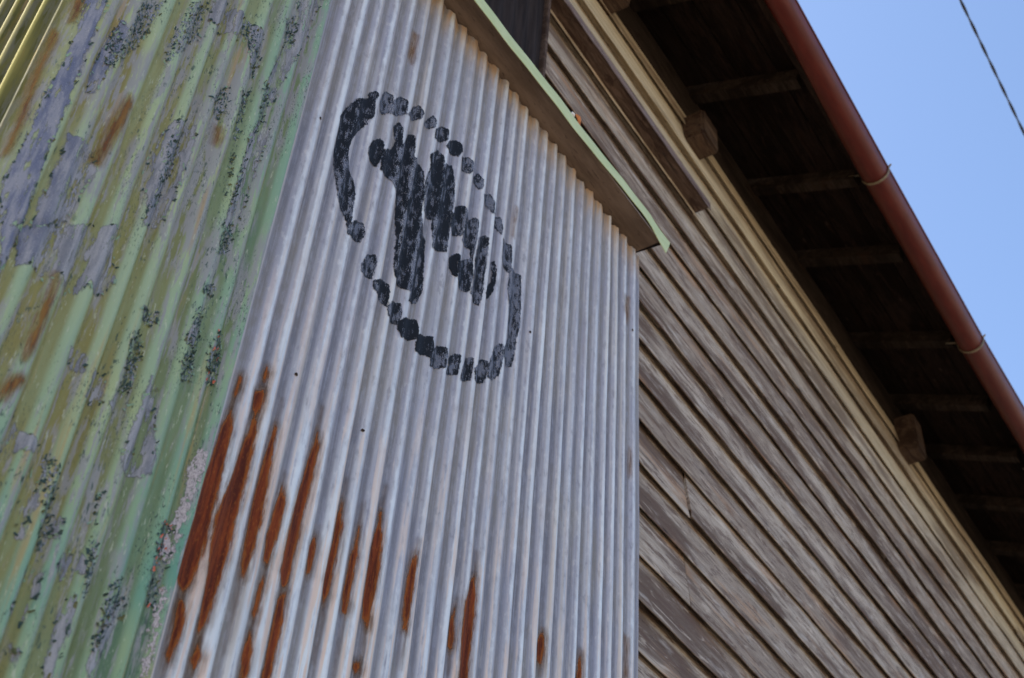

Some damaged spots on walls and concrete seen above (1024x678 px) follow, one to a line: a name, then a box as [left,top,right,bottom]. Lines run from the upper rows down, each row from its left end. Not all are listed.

peeling [0,0,167,297]
peeling [142,118,198,229]
peeling [163,0,322,255]
peeling [67,306,160,478]
peeling [180,281,223,386]
peeling [0,409,66,629]
peeling [40,490,107,678]
corrosion [165,367,320,678]
corrosion [322,504,383,629]
corrosion [402,556,417,631]
corrosion [447,576,476,678]
corrosion [537,633,545,664]